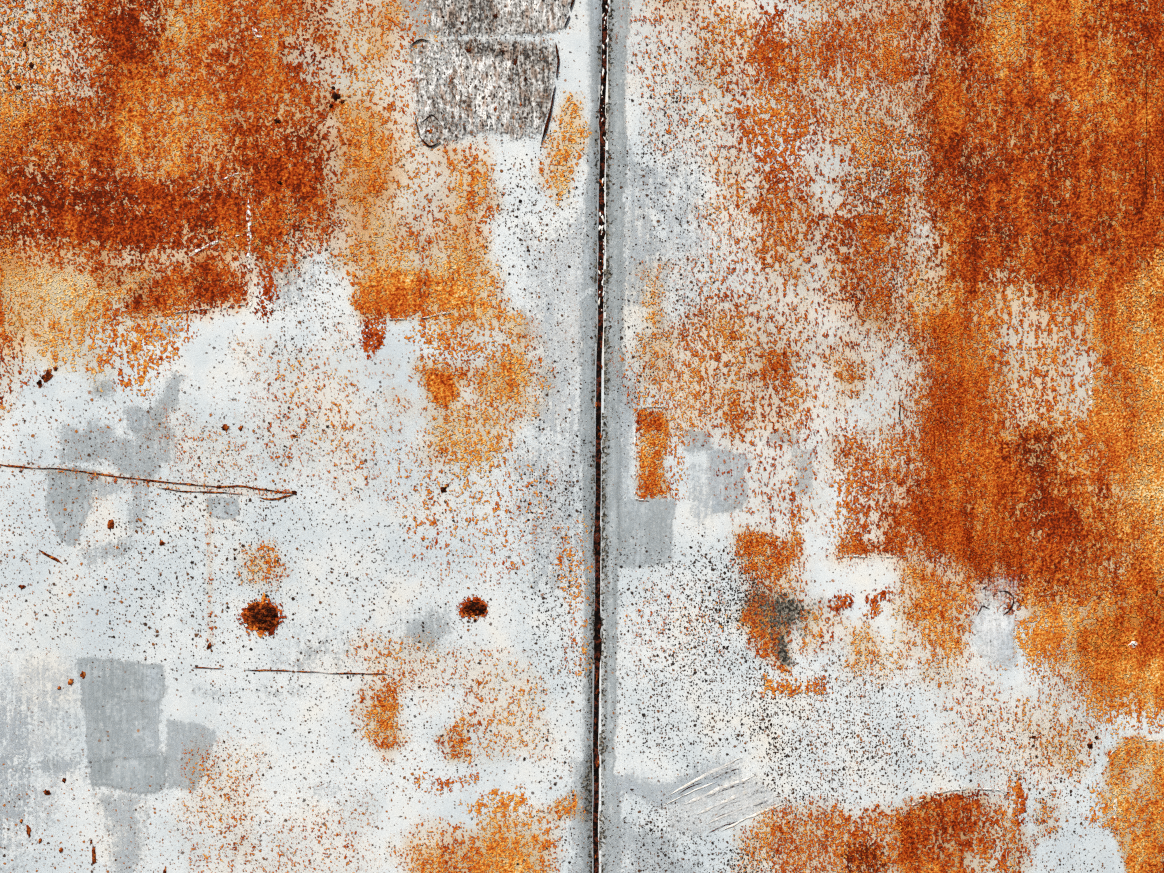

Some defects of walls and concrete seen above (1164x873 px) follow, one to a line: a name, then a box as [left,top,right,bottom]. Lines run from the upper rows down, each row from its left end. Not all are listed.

corrosion [173,736,371,873]
corrosion [0,0,600,694]
corrosion [346,625,598,873]
corrosion [601,0,1164,873]